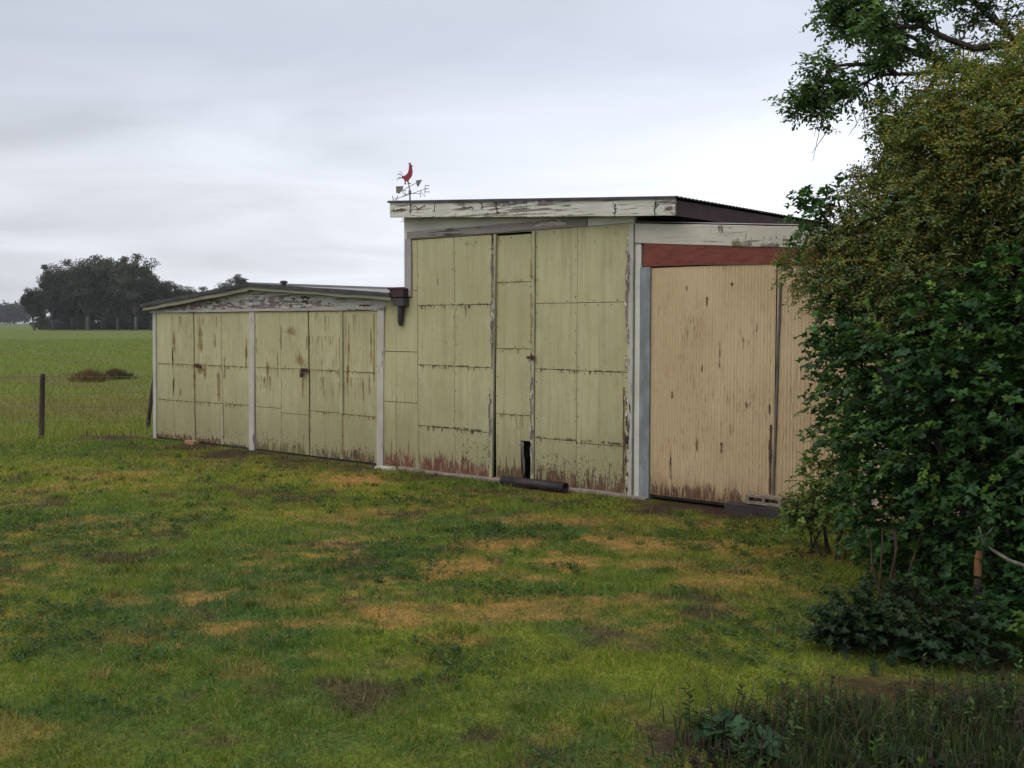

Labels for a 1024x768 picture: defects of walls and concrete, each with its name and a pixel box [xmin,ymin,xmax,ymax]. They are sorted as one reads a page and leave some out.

peeling [158,295,331,311]
rust [193,339,257,406]
rust [340,414,523,478]
rust [536,388,625,493]
rust [650,440,741,503]